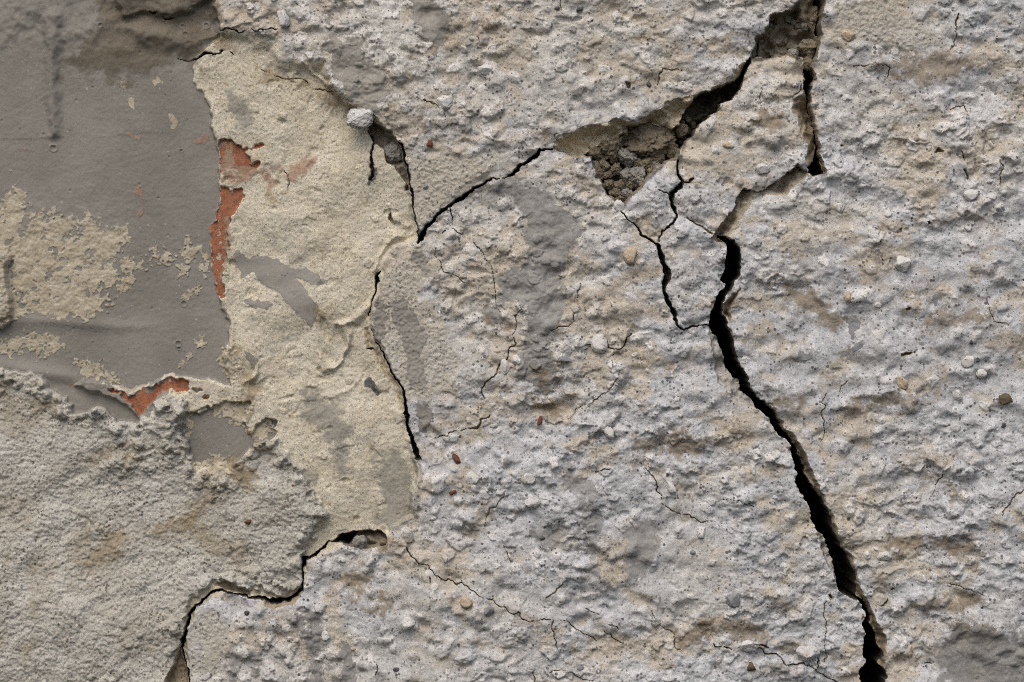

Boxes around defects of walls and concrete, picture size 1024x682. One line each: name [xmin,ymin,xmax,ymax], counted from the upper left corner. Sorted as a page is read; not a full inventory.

peeling [228,91,255,126]
flaking render [585,126,680,206]
peeling [0,138,326,363]
peeling [69,335,278,444]
peeling [194,452,233,475]
peeling [299,385,357,480]
peeling [330,449,418,549]
crack [365,58,932,682]
crack [165,540,330,682]